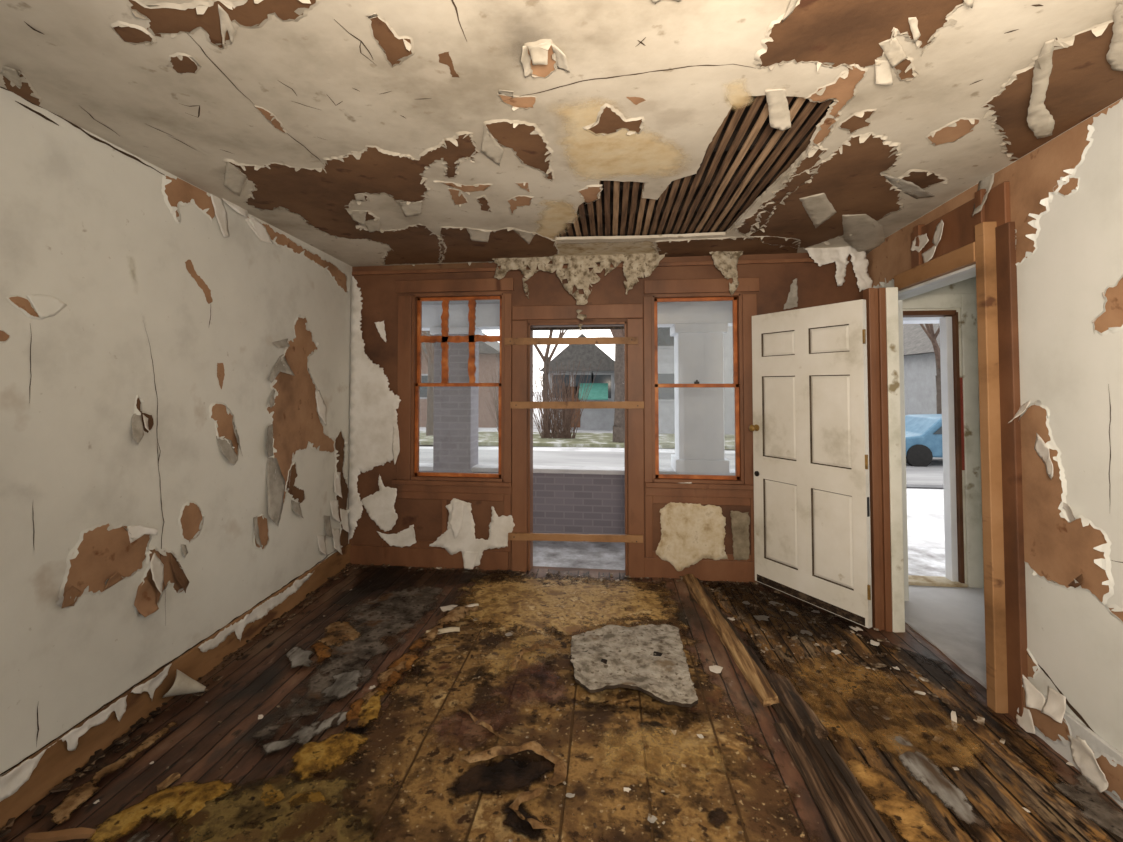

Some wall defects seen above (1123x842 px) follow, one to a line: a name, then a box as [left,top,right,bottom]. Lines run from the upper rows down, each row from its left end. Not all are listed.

peeling [110,0,1123,571]
peeling [56,500,206,617]
peeling [1008,400,1123,624]
peeling [1016,648,1123,803]